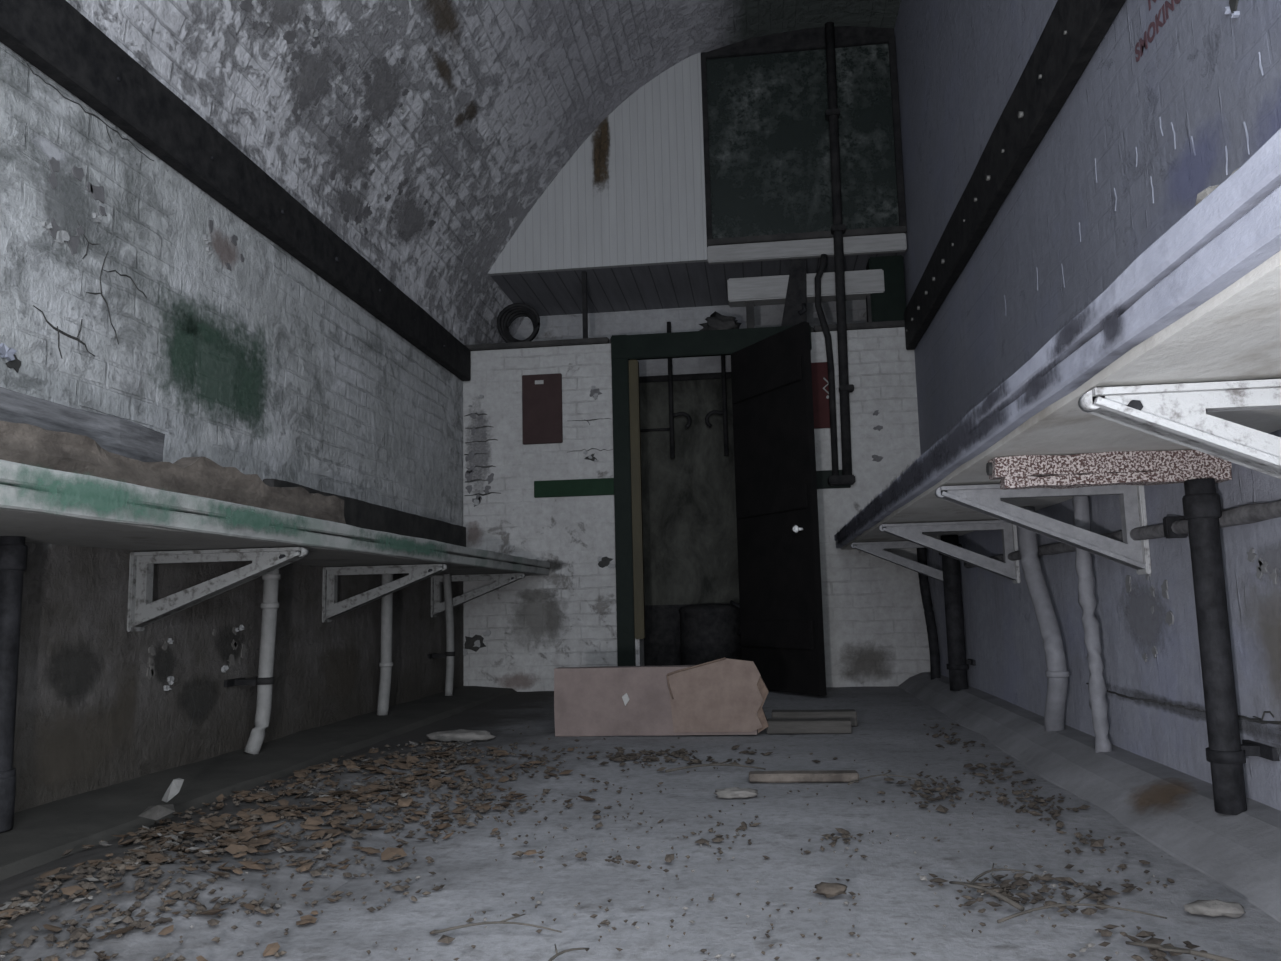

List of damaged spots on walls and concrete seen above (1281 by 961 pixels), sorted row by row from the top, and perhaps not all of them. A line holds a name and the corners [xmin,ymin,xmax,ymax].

leakage [163,300,267,432]
leakage [1125,691,1206,720]